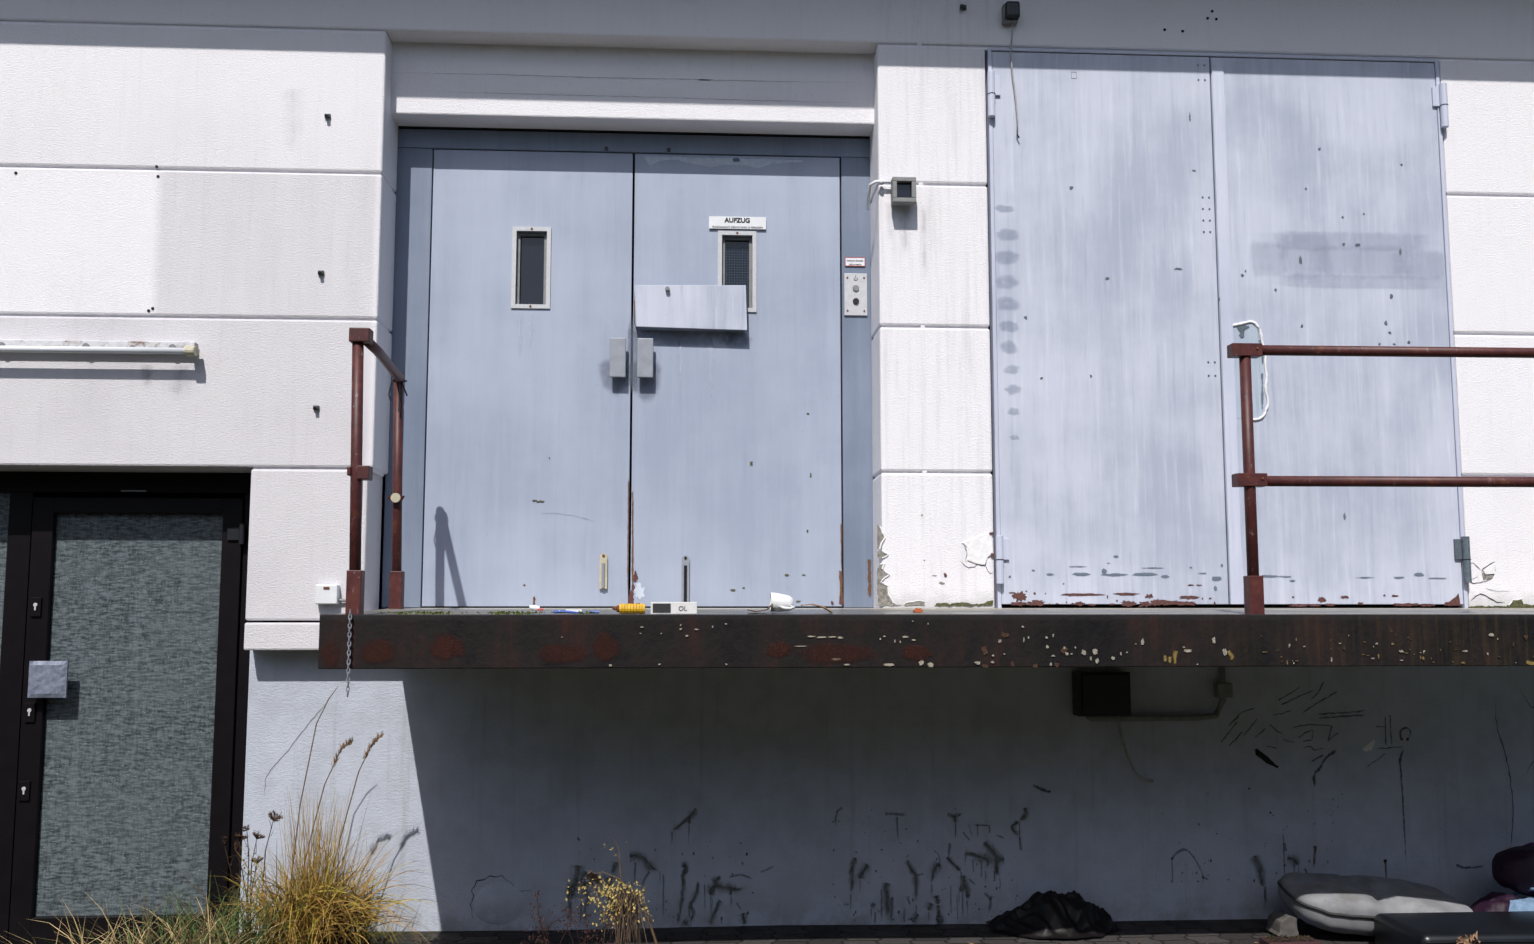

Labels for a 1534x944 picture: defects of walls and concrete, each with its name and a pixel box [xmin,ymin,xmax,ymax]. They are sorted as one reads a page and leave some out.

spalling [877,525,993,624]
peeling [1009,584,1216,607]
peeling [1291,596,1363,607]
peeling [1383,594,1534,608]
leakage [907,842,1004,920]